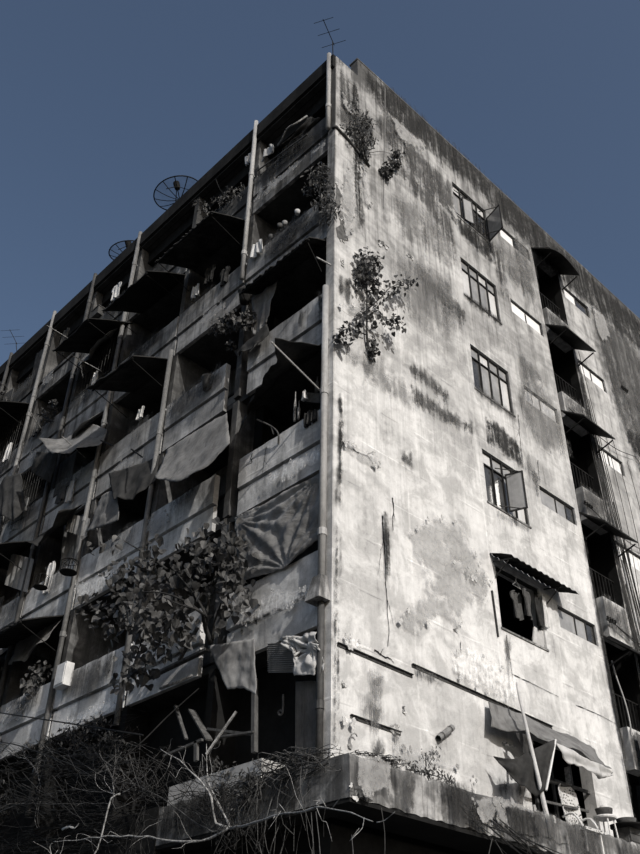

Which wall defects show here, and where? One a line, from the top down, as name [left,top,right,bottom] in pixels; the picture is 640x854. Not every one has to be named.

leakage [337,71,640,465]
leakage [336,395,344,501]
leakage [486,421,536,480]
leakage [394,764,415,811]
leakage [441,779,601,854]